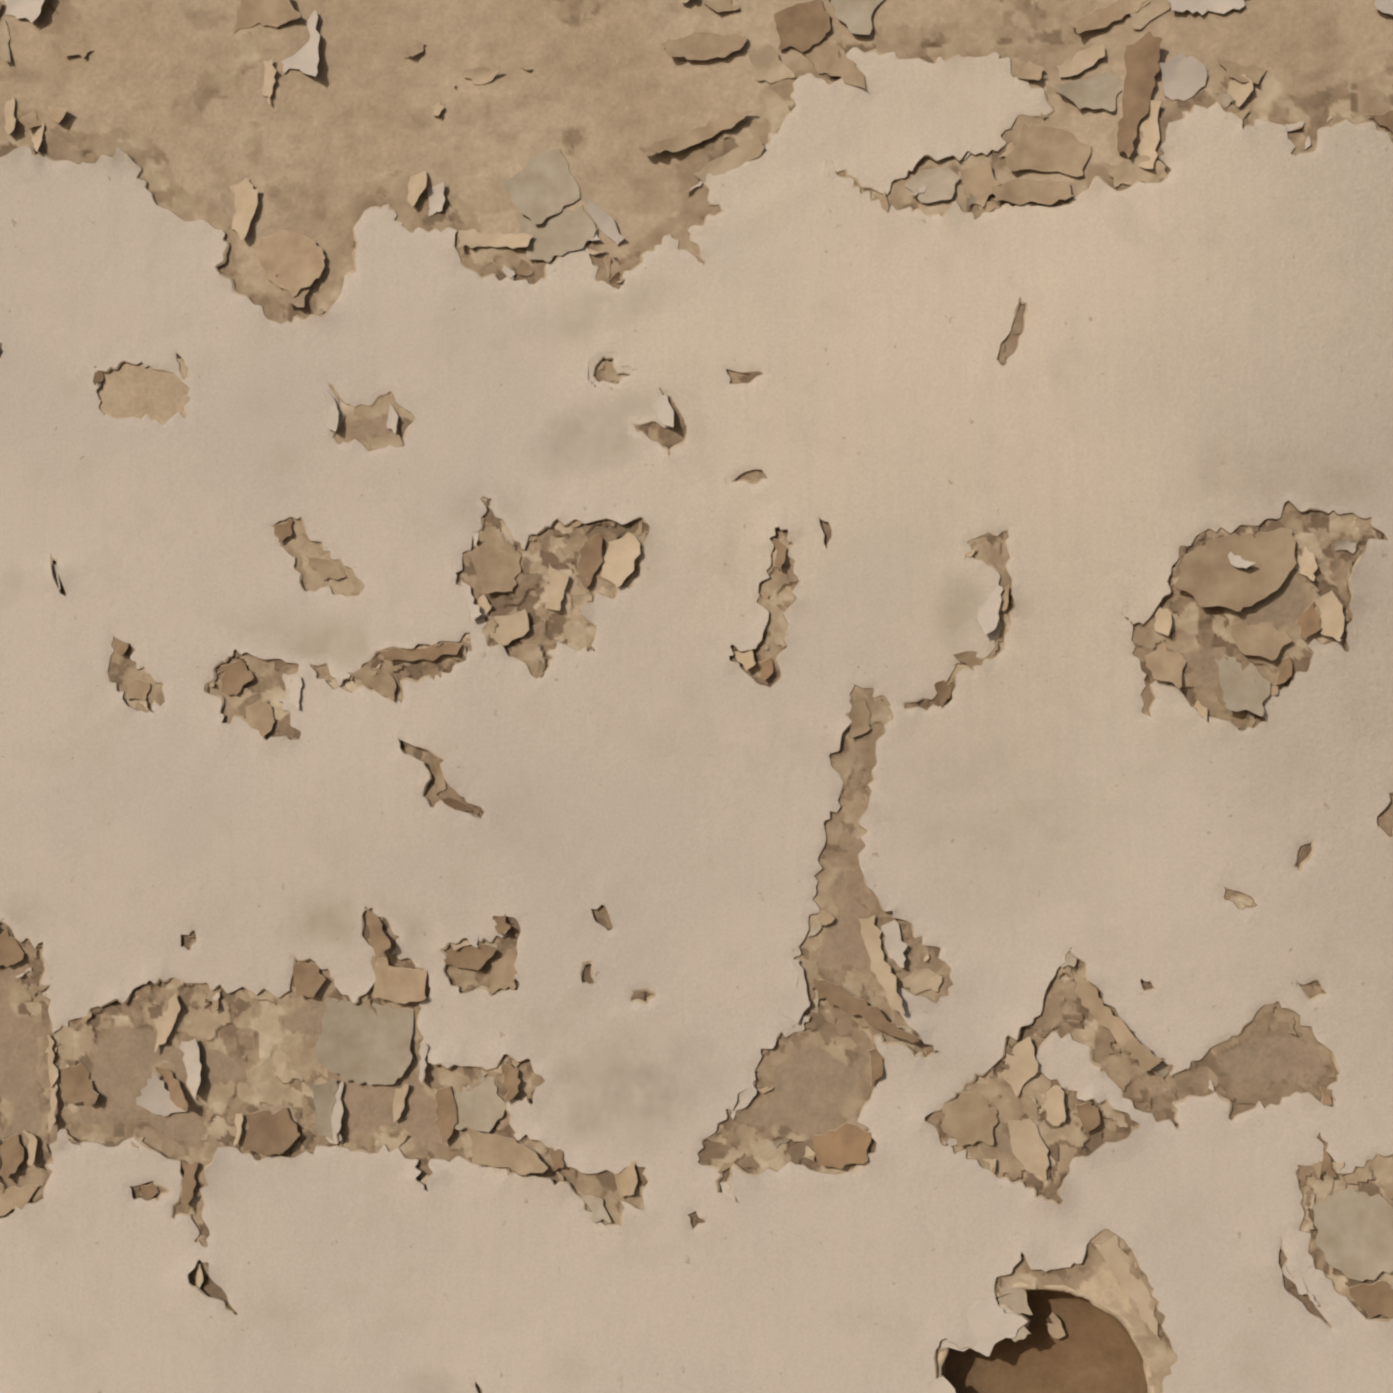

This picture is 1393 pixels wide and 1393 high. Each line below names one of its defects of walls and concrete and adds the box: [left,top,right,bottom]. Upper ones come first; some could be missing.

peeling [0,0,1393,324]
peeling [93,358,190,424]
peeling [322,386,415,451]
peeling [109,637,165,712]
peeling [205,497,650,740]
peeling [400,740,484,818]
peeling [698,527,1014,1202]
peeling [1125,501,1387,730]
peeling [0,905,648,1315]
peeling [925,952,1338,1204]
spalling [928,1285,1148,1393]
peeling [1281,1133,1393,1319]